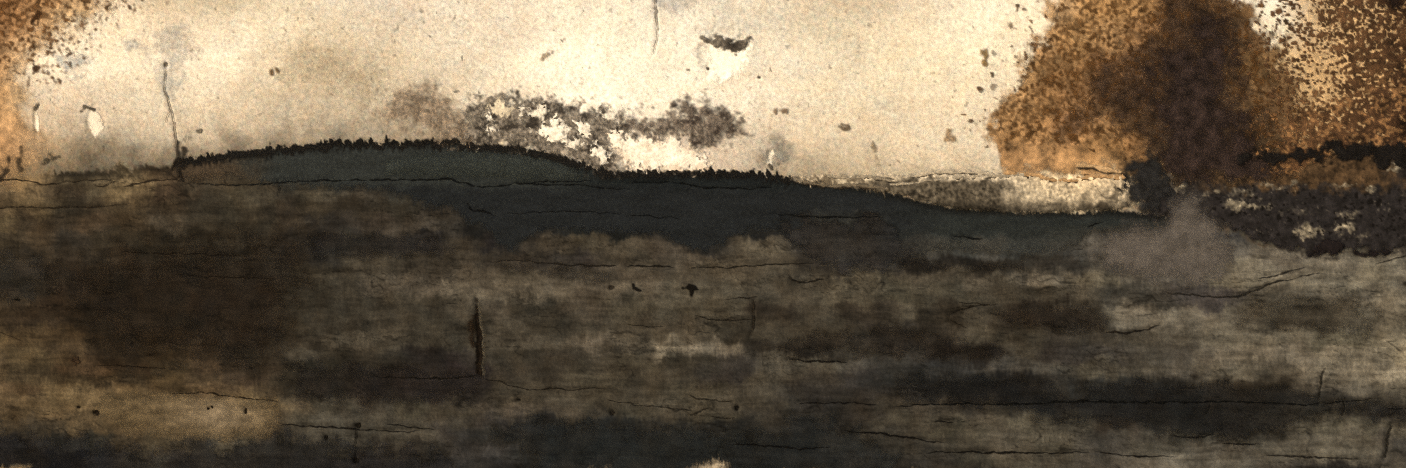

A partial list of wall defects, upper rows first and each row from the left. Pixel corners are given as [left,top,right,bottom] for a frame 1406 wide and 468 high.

leakage [0,146,22,179]
rust [0,0,142,184]
crack [0,70,878,219]
leakage [174,84,1406,284]
rust [961,0,1406,188]
leakage [995,302,1110,335]
leakage [1236,296,1381,339]
leakage [0,420,453,468]
leakage [293,358,482,411]
leakage [489,412,902,468]
crack [377,298,1406,468]
leakage [768,324,1406,444]